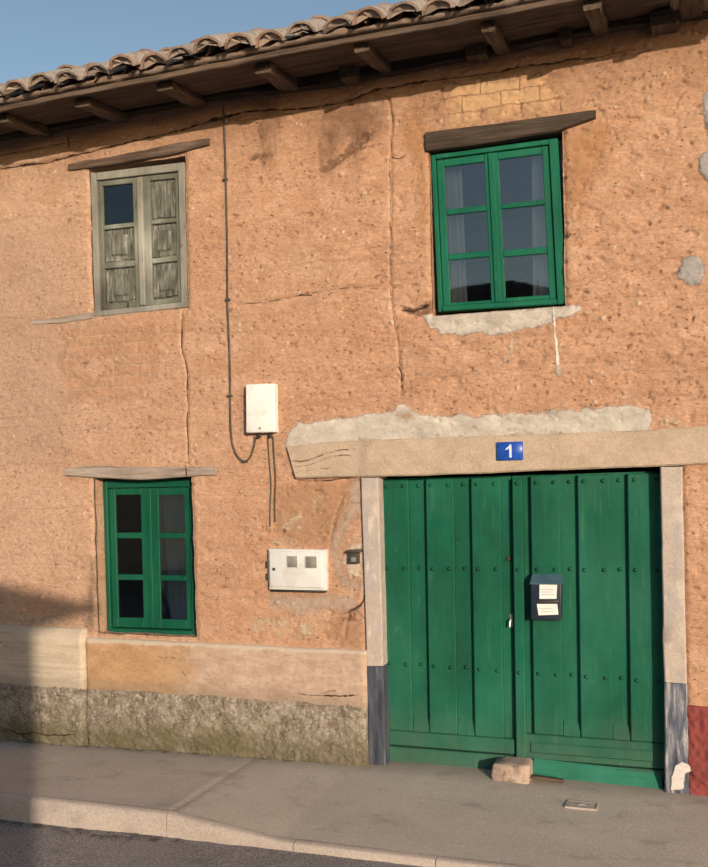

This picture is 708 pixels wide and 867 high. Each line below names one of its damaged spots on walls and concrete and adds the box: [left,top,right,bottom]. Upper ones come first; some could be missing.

crack [1,48,629,390]
crack [181,312,189,477]
crack [297,689,354,697]